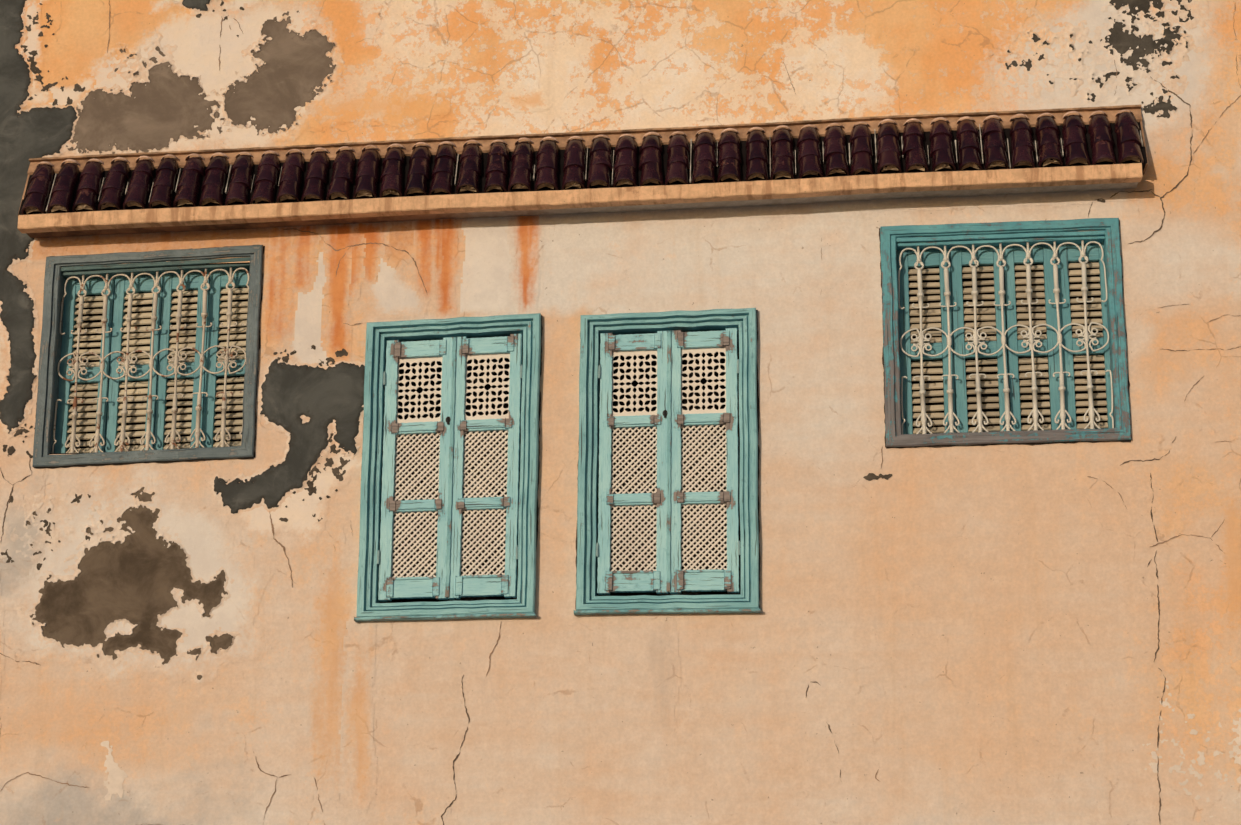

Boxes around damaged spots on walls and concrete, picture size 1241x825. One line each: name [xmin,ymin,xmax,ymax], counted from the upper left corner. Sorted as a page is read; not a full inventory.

flaking render [971,0,1229,143]
crack [1088,16,1241,244]
peeling [0,324,11,398]
corrosion [25,218,466,363]
peeling [273,250,348,370]
corrosion [505,215,545,314]
peeling [1,432,362,689]
crack [269,511,293,588]
crack [1087,437,1225,822]
crack [441,624,501,825]